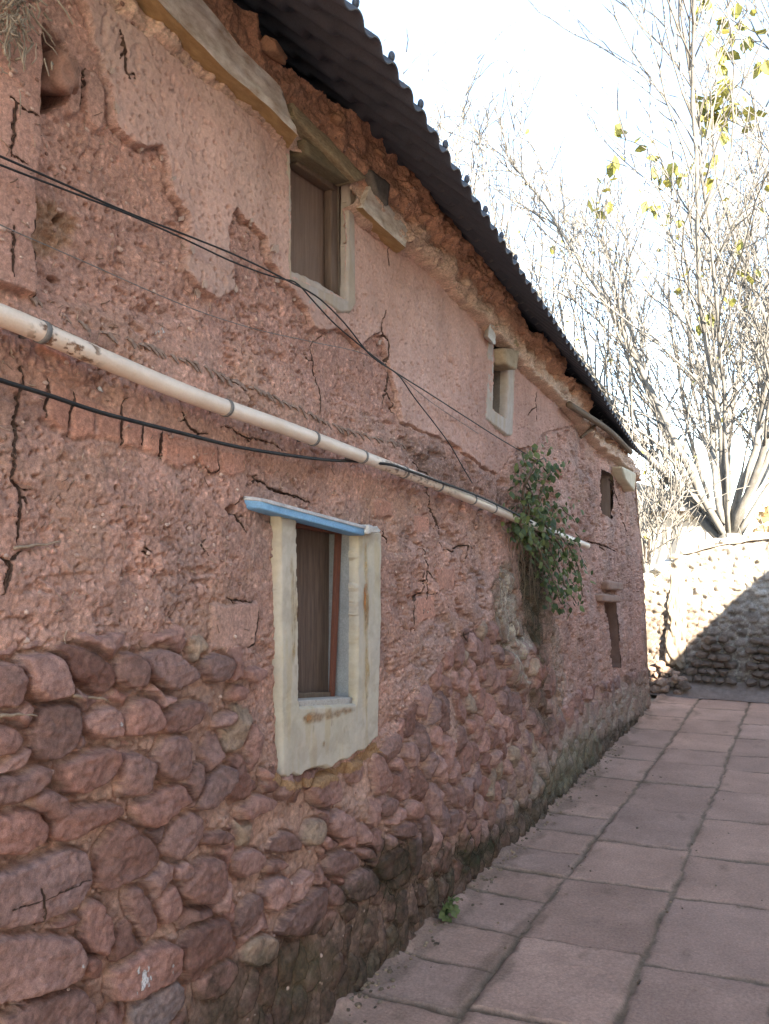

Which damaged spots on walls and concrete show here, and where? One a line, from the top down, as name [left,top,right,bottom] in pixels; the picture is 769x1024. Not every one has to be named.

crack [9,96,42,164]
spalling [31,22,405,436]
crack [305,336,321,411]
crack [366,311,394,413]
crack [0,366,76,595]
crack [120,397,283,473]
crack [232,475,310,532]
crack [412,462,479,631]